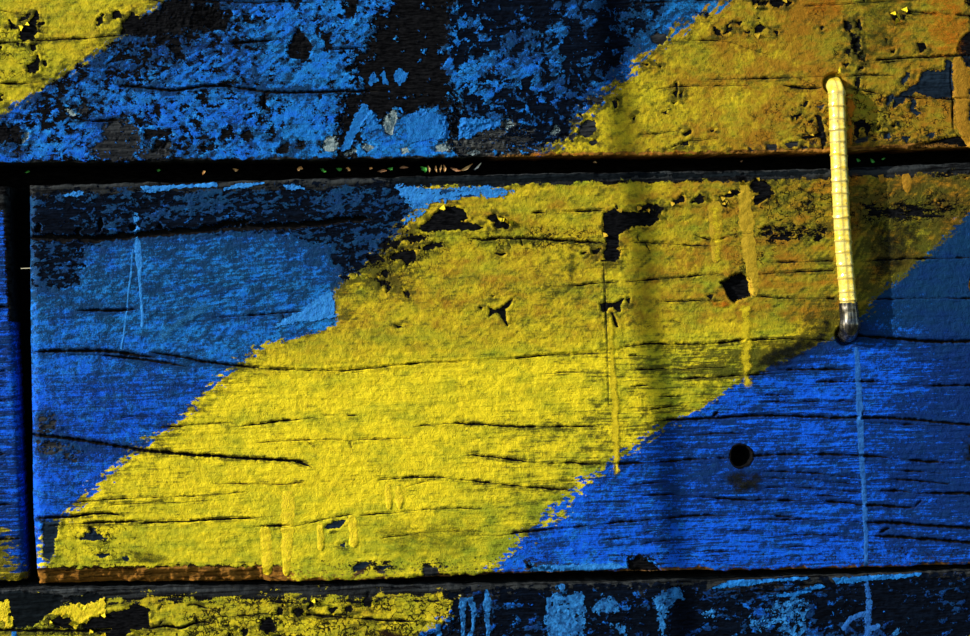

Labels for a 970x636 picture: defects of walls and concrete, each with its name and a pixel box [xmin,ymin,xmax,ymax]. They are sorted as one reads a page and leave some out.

peeling [705,0,792,39]
peeling [835,19,866,99]
peeling [885,31,970,117]
peeling [767,101,827,151]
peeling [853,117,910,143]
peeling [30,169,828,293]
crack [760,260,834,300]
crack [35,267,970,552]
peeling [0,590,150,636]
peeling [228,599,318,636]
peeling [328,591,375,616]
peeling [430,571,970,636]